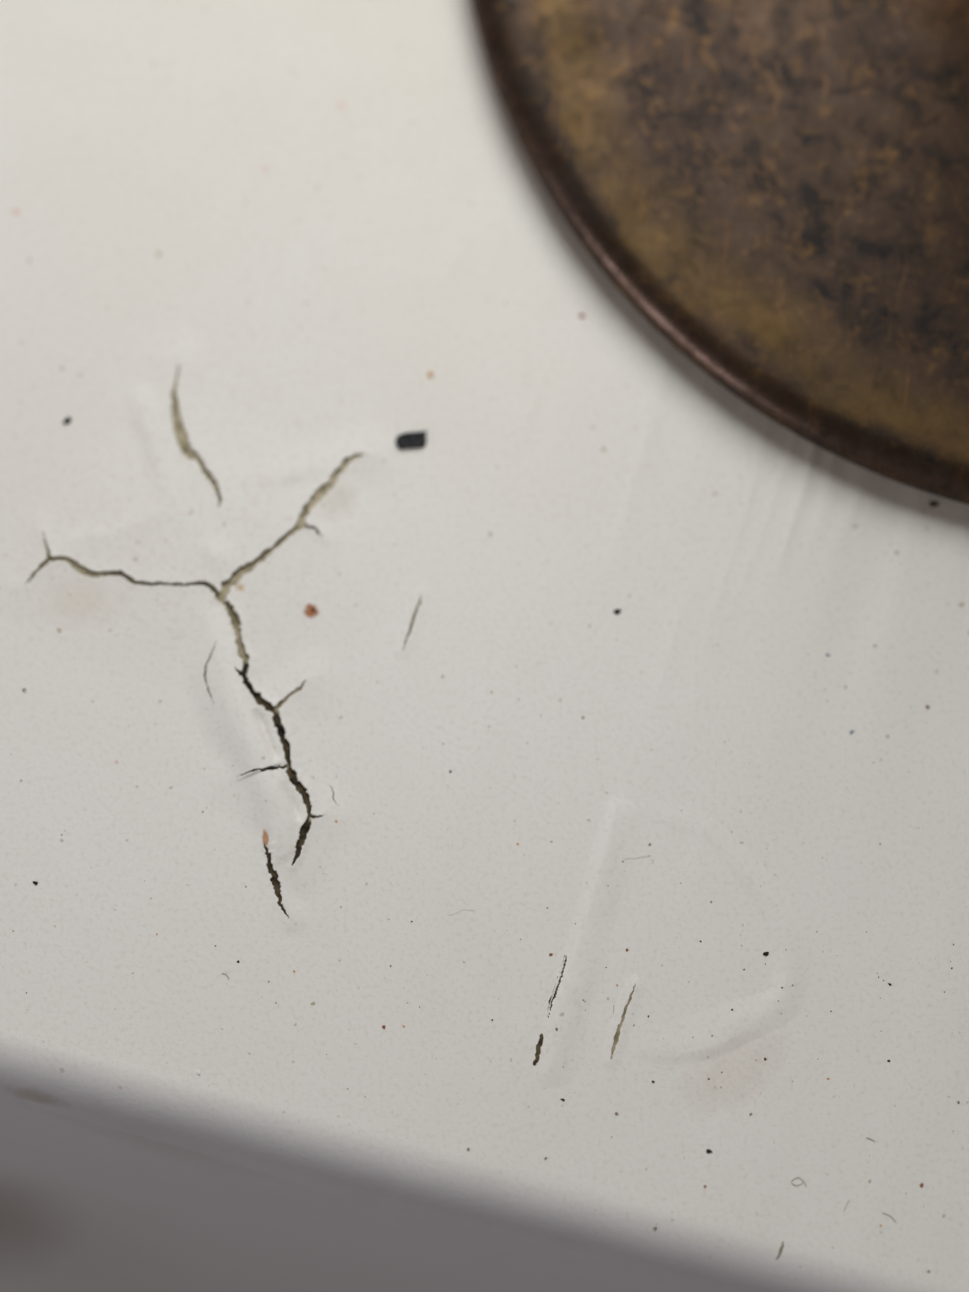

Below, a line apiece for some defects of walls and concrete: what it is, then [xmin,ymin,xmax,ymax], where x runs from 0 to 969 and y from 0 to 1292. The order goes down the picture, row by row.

crack [171,364,222,508]
crack [27,454,363,916]
crack [533,955,567,1065]
crack [600,974,647,1071]